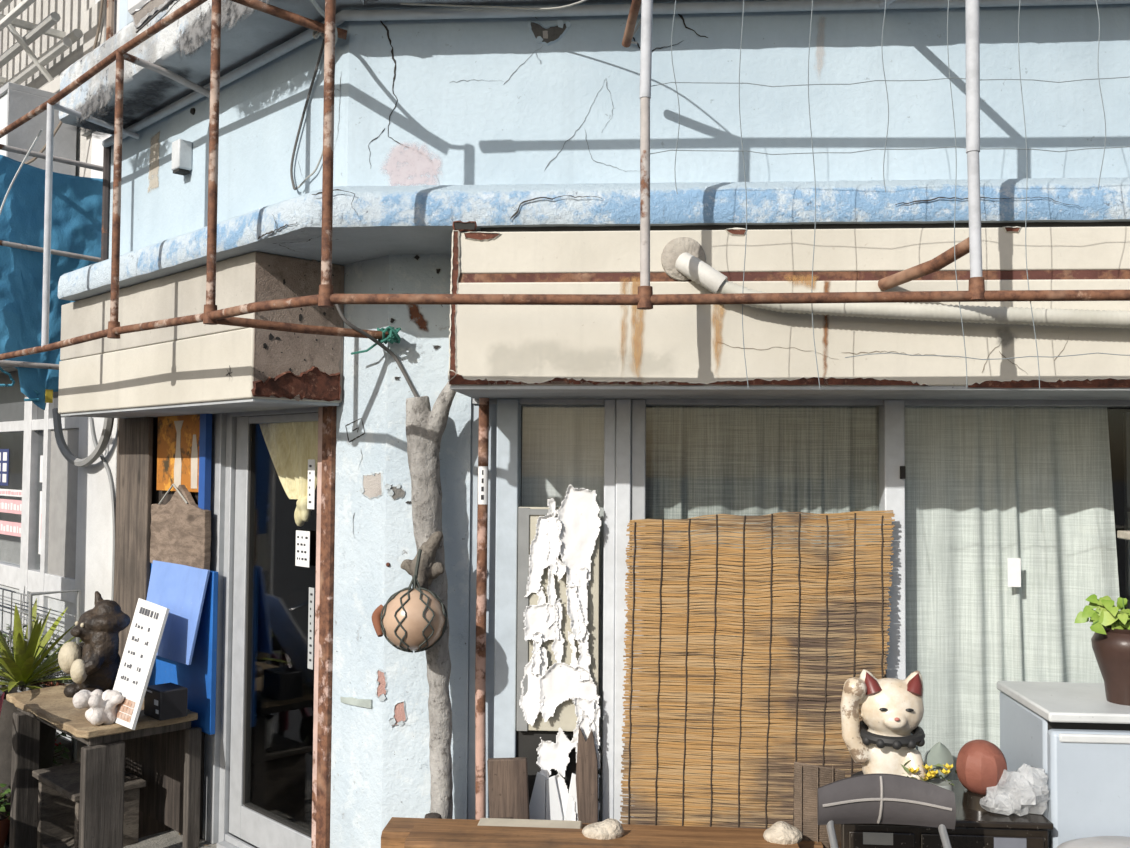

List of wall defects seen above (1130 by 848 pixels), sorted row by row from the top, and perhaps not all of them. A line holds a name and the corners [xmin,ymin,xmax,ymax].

spalling [528,19,571,46]
crack [368,21,439,181]
peeling [384,145,440,186]
crack [510,80,637,220]
crack [895,197,1082,208]
crack [258,214,322,253]
spalling [254,254,341,383]
corrosion [448,230,929,386]
corrosion [968,376,1130,388]
peeling [359,471,412,505]
peeling [375,668,408,727]